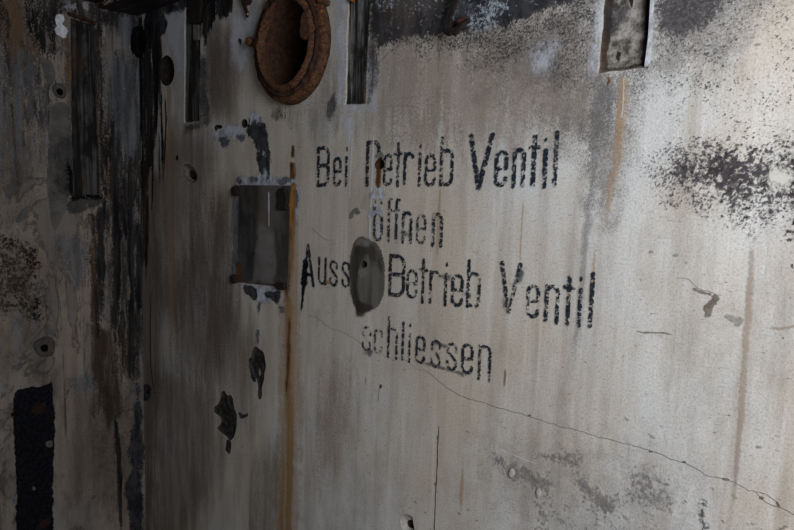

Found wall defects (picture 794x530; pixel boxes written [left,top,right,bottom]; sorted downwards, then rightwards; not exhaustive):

water stain [376,0,527,72]
water stain [534,2,599,90]
water stain [102,53,140,160]
water stain [641,0,794,244]
peeling [219,113,300,243]
water stain [141,70,245,530]
spalling [249,329,266,399]
peeling [243,283,285,313]
rust [282,146,296,530]
spalling [214,391,248,454]
crack [309,315,794,530]